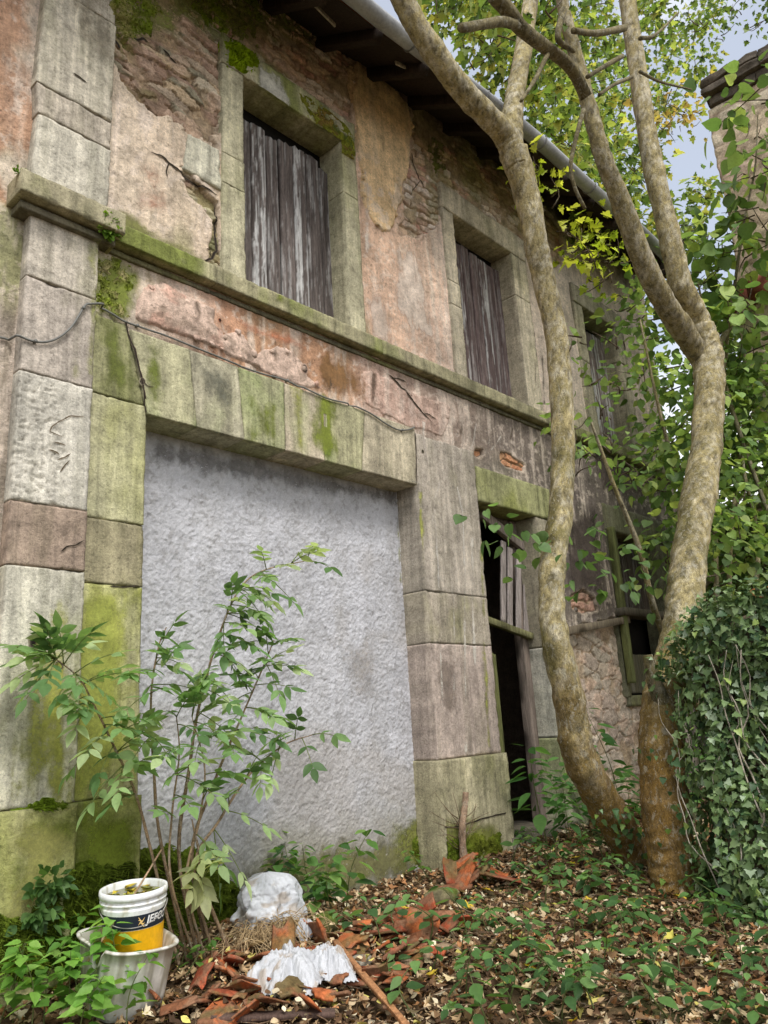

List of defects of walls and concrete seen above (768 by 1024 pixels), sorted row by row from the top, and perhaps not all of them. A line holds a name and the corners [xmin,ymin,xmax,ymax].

spalling [114,0,527,267]
crack [152,152,218,262]
spalling [544,214,561,268]
damp [206,374,229,403]
crack [390,375,436,485]
spalling [499,453,526,471]